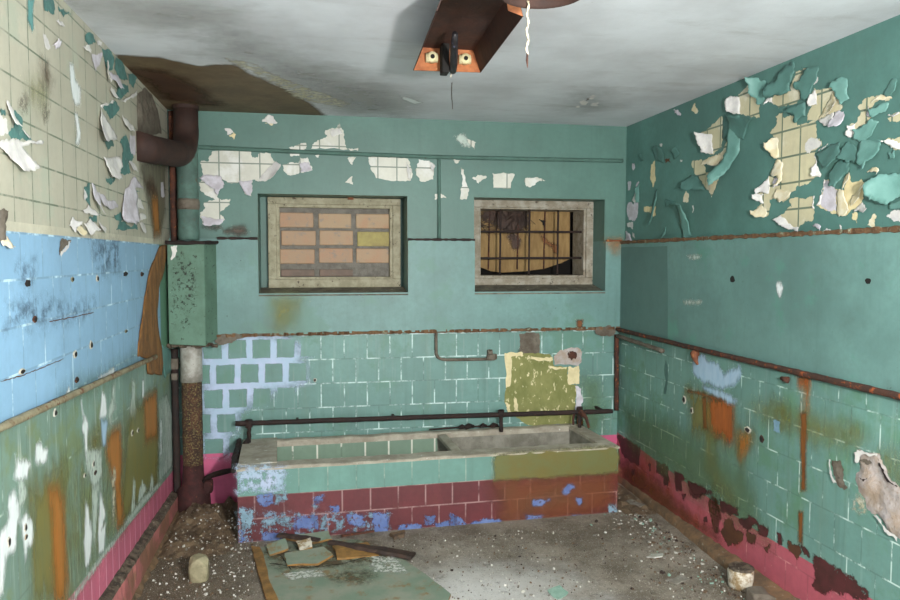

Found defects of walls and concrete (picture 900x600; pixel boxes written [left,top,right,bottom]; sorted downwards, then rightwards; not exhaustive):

leakage [116,55,325,116]
peeling [59,32,162,256]
peeling [368,157,435,182]
peeling [625,61,900,241]
corrosion [92,394,159,526]
peeling [202,333,317,473]
peeling [238,493,501,542]
peeling [504,332,583,426]
corrosion [687,390,751,462]
peeling [617,435,869,600]
corrosion [799,378,809,491]
spalling [829,449,900,541]